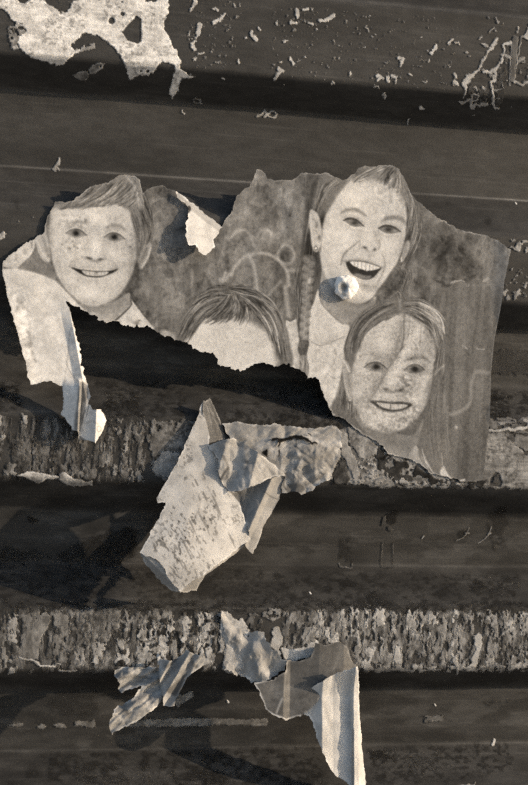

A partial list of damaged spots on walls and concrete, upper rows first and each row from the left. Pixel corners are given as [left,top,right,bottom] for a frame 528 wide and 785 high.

peeling [0,0,193,99]
peeling [188,0,240,68]
peeling [371,17,528,116]
peeling [18,471,92,486]